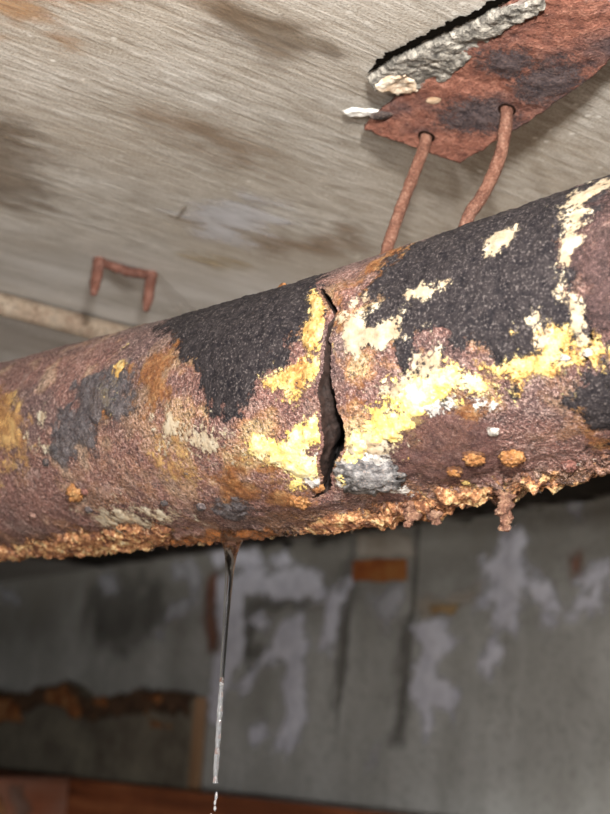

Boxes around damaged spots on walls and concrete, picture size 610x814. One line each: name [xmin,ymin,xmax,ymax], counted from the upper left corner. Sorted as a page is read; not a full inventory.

spalling [366,0,546,96]
spalling [342,107,379,117]
corrosion [333,242,415,333]
corrosion [128,339,179,420]
crack [312,288,346,498]
corrosion [0,519,222,562]
corrosion [194,425,610,541]
water stain [446,500,498,521]
water stain [513,474,610,513]
water stain [32,520,424,755]
efflorescence [476,525,610,681]
spalling [0,680,191,723]